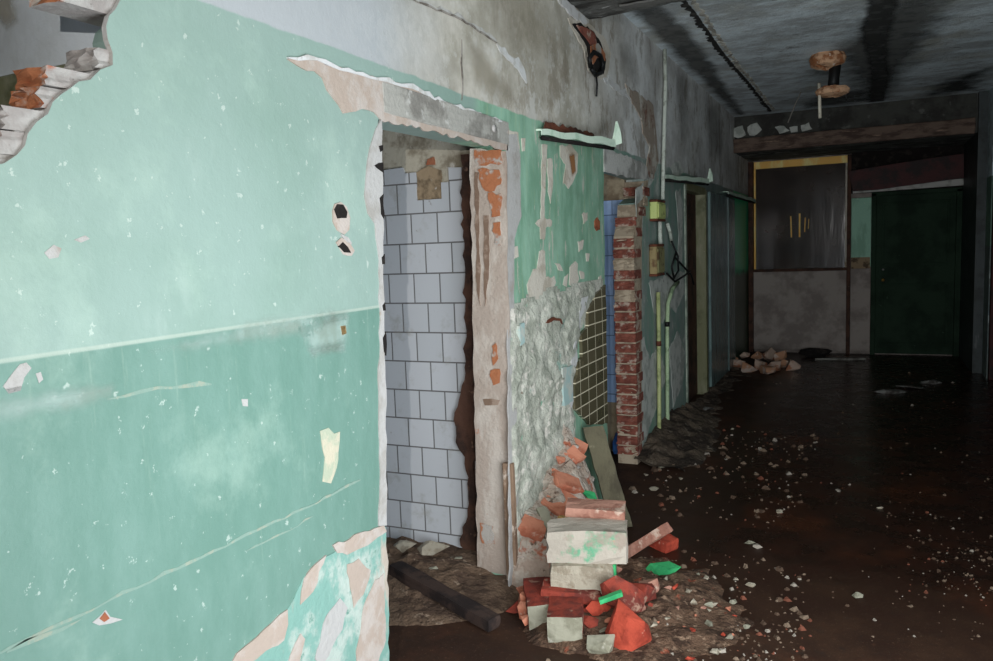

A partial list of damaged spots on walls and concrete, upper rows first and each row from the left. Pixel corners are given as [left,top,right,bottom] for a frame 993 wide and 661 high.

spalling [0,48,110,164]
spalling [29,0,117,27]
crack [413,0,527,101]
damp [808,0,948,107]
damp [931,71,983,95]
peeling [3,363,43,394]
peeling [232,54,525,661]
spalling [490,83,685,549]
peeling [92,610,122,625]